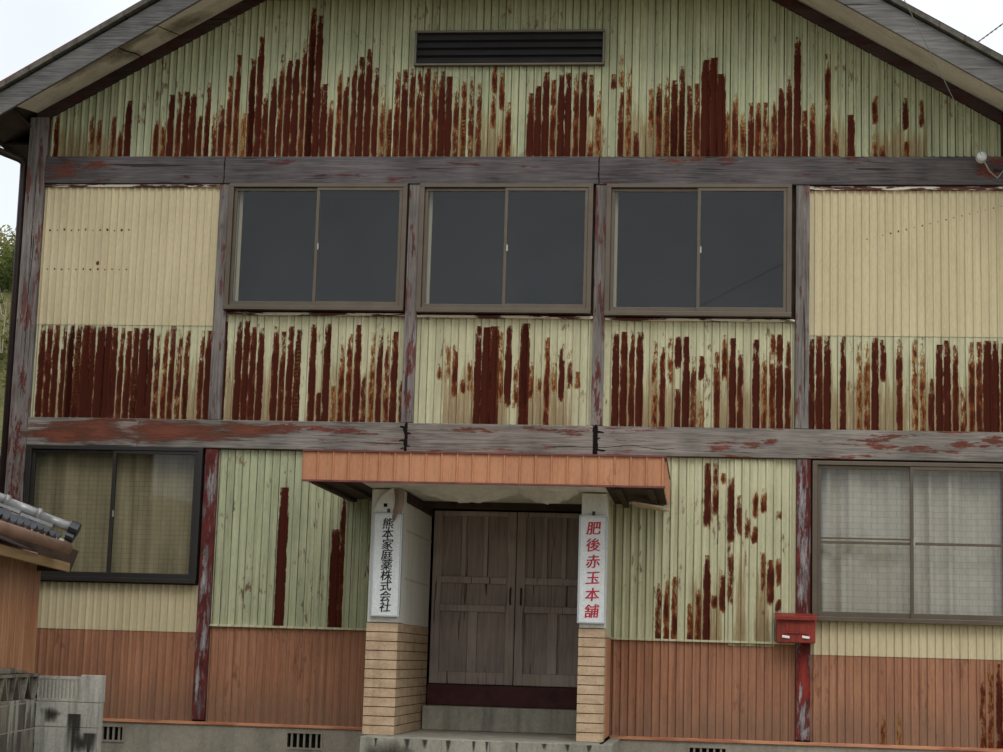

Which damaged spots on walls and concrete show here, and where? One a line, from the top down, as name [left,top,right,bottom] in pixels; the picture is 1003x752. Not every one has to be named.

rust [152,8,512,157]
rust [526,37,855,157]
rust [34,325,212,420]
rust [221,320,402,423]
rust [611,330,791,429]
rust [809,336,1003,432]
peeling [741,438,778,449]
peeling [850,434,1003,452]
rust [655,463,782,640]
peeling [797,465,809,607]
peeling [194,547,208,709]
peeling [796,645,810,742]